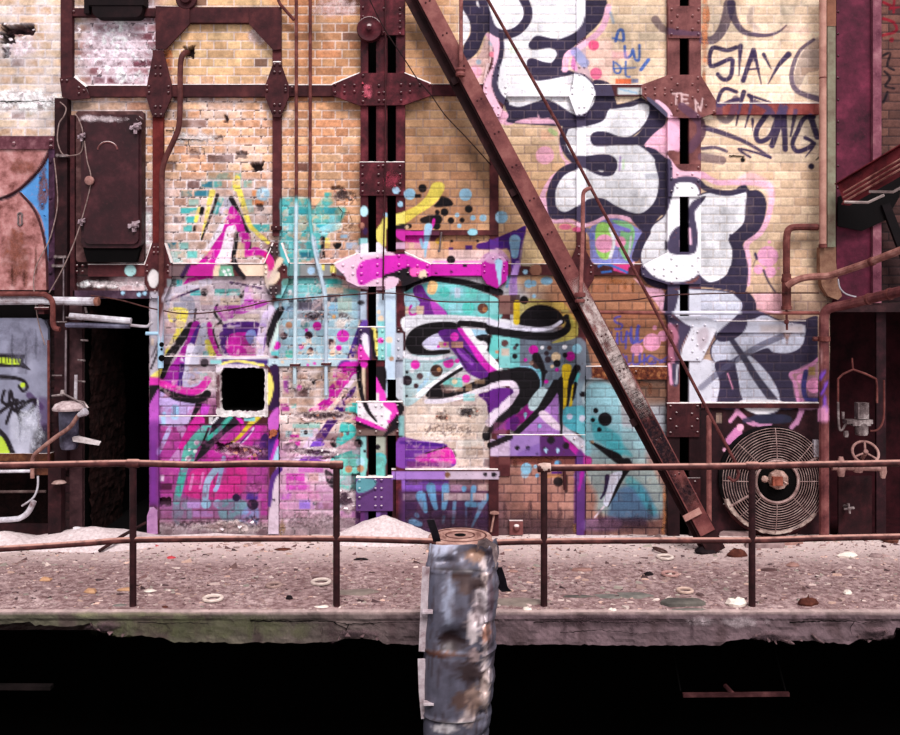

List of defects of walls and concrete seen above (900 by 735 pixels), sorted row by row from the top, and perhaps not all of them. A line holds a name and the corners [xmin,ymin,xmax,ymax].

corrosion [702,0,710,62]